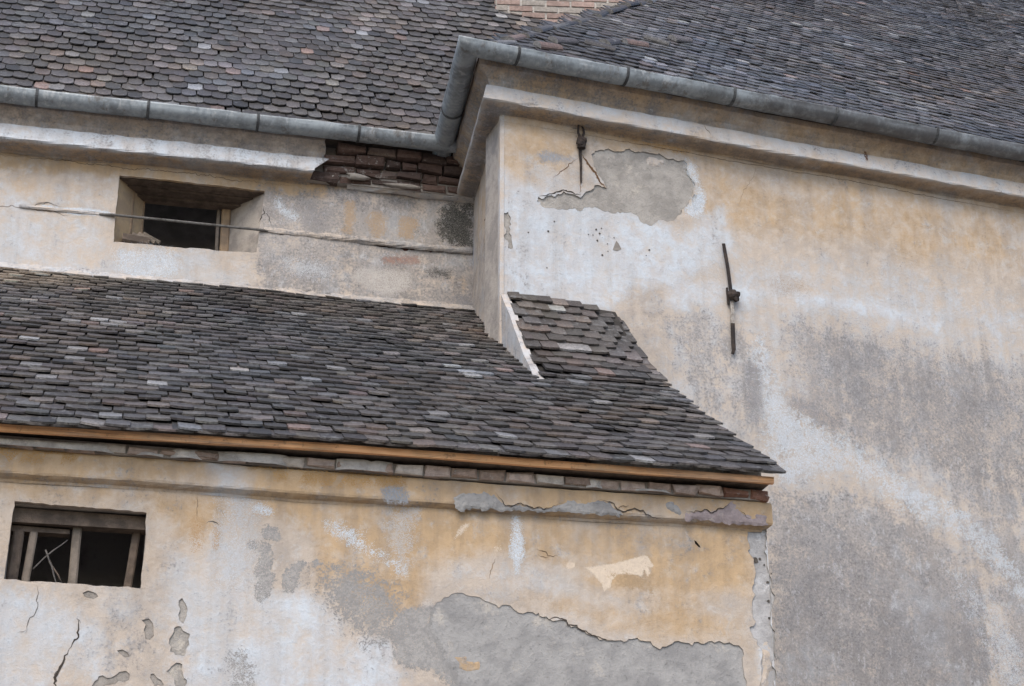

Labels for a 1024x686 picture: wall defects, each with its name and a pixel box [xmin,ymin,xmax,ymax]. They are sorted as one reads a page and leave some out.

mould [434,201,474,249]
spalling [537,149,701,232]
crack [545,128,1023,214]
damp [742,307,1024,686]
crack [53,618,80,686]
spalling [92,671,130,686]
spalling [142,618,154,640]
spalling [150,598,190,686]
spalling [245,523,777,686]